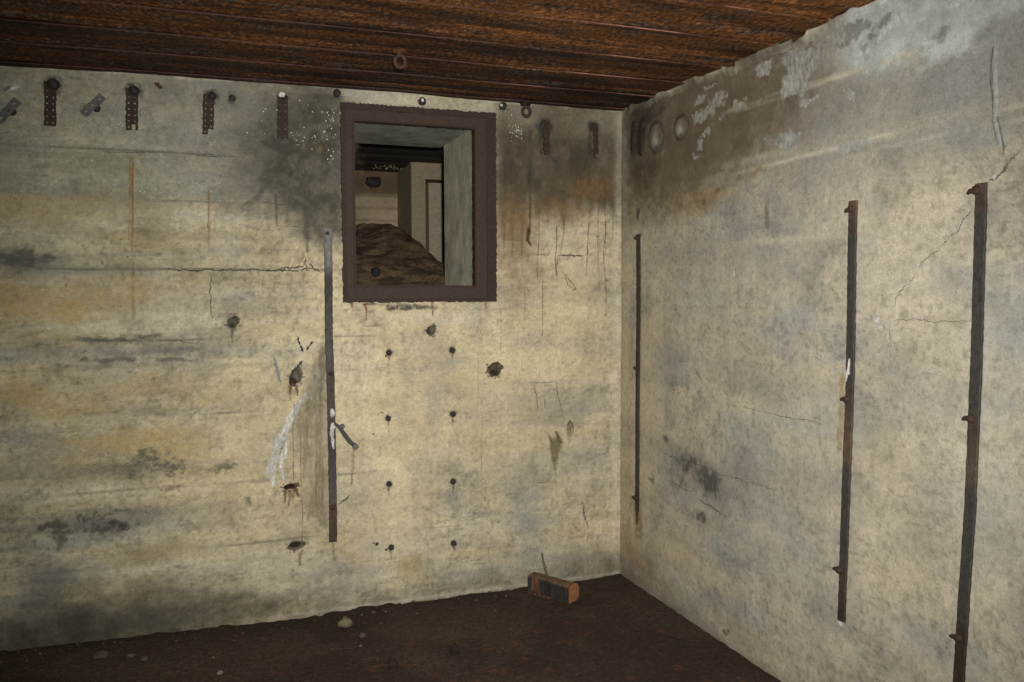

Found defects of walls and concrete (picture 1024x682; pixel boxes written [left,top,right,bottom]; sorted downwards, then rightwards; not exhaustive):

leakage [262,102,341,267]
leakage [628,49,797,212]
crack [987,152,1019,182]
crack [150,264,322,321]
crack [875,208,973,367]
leakage [267,347,337,524]
leakage [685,459,717,491]